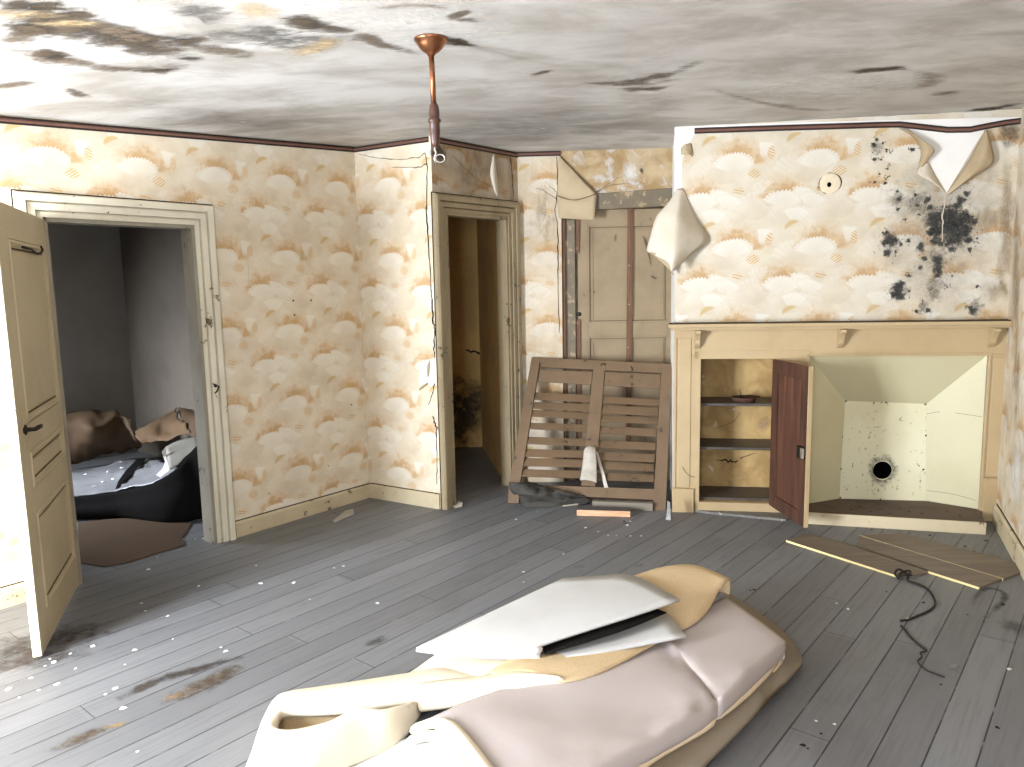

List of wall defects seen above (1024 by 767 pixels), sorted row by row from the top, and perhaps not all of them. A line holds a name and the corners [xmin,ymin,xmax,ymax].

water stain [1,0,410,74]
water stain [448,11,474,22]
water stain [590,73,670,91]
peeling [675,117,1021,195]
crack [360,153,435,358]
water stain [869,132,987,317]
crack [429,384,438,481]